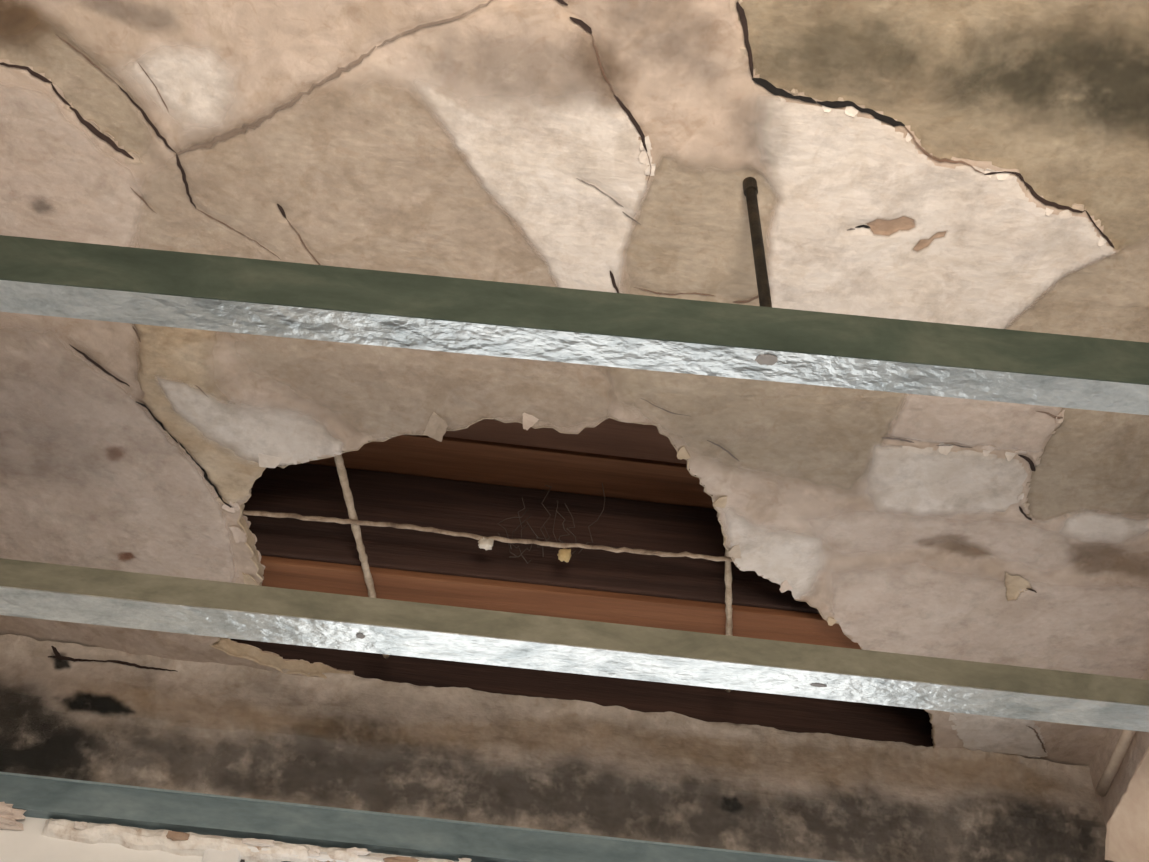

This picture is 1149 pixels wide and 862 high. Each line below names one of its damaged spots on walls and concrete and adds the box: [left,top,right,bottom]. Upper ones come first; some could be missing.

crack [0,62,134,159]
crack [55,0,492,265]
spalling [0,0,1149,343]
crack [557,0,651,185]
crack [736,2,1114,248]
damp [965,37,1149,124]
peeling [0,334,258,586]
peeling [160,380,342,468]
peeling [229,332,1149,679]
damp [54,654,70,669]
damp [0,688,785,852]
damp [789,800,1095,862]